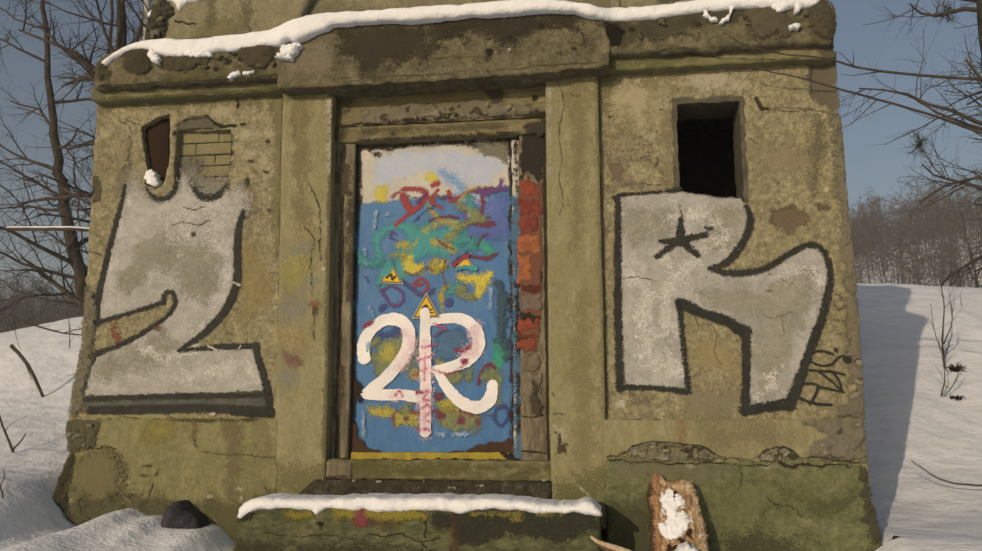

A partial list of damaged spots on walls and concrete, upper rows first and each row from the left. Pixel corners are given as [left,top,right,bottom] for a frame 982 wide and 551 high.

spalling [145,0,175,40]
spalling [171,99,281,187]
spalling [324,86,558,416]
water stain [89,0,809,551]
spalling [626,440,727,469]
water stain [61,486,172,526]